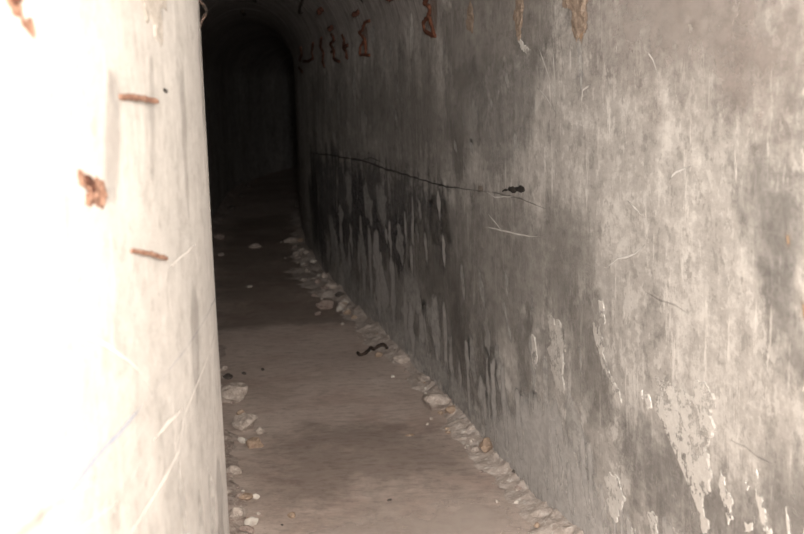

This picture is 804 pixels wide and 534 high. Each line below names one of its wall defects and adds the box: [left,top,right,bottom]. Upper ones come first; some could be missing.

spalling [562,0,588,42]
crack [315,153,461,189]
damp [308,144,631,534]
peeling [639,377,734,534]
peeling [744,469,773,534]